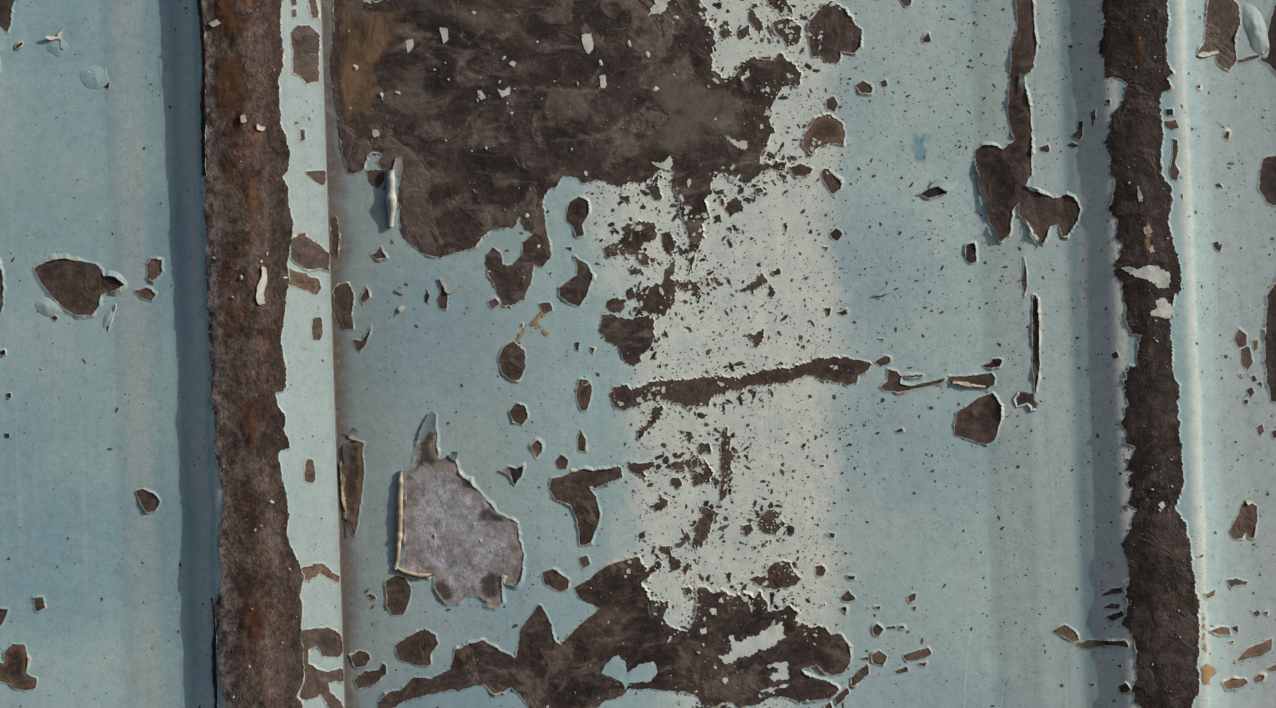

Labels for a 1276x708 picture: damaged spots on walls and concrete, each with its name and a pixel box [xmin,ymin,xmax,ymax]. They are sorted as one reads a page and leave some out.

peeling [1038,143,1051,154]
peeling [1066,98,1112,149]
peeling [1255,152,1276,208]
peeling [1212,240,1223,254]
peeling [32,253,165,321]
rust [200,0,305,708]
peeling [288,0,933,708]
peeling [980,356,1004,371]
peeling [1232,274,1276,406]
peeling [951,390,1005,448]
peeling [1255,422,1276,440]
peeling [0,606,10,630]